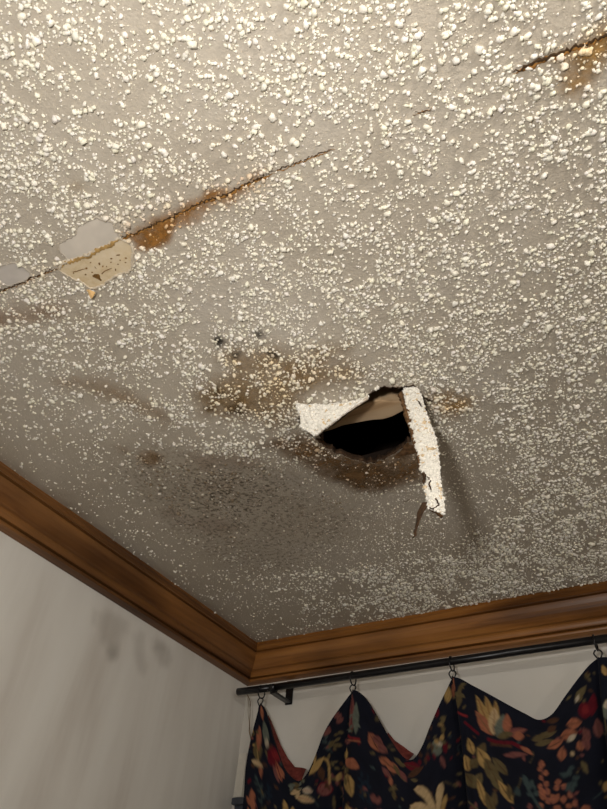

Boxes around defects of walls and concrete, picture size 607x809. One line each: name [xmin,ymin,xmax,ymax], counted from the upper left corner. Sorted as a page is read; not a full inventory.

crack [513,33,607,74]
rust [575,31,607,67]
rust [128,191,222,248]
crack [121,149,335,240]
crack [0,269,58,292]
peeling [0,0,607,641]
damp [207,353,324,417]
damp [443,396,466,411]
damp [274,437,419,490]